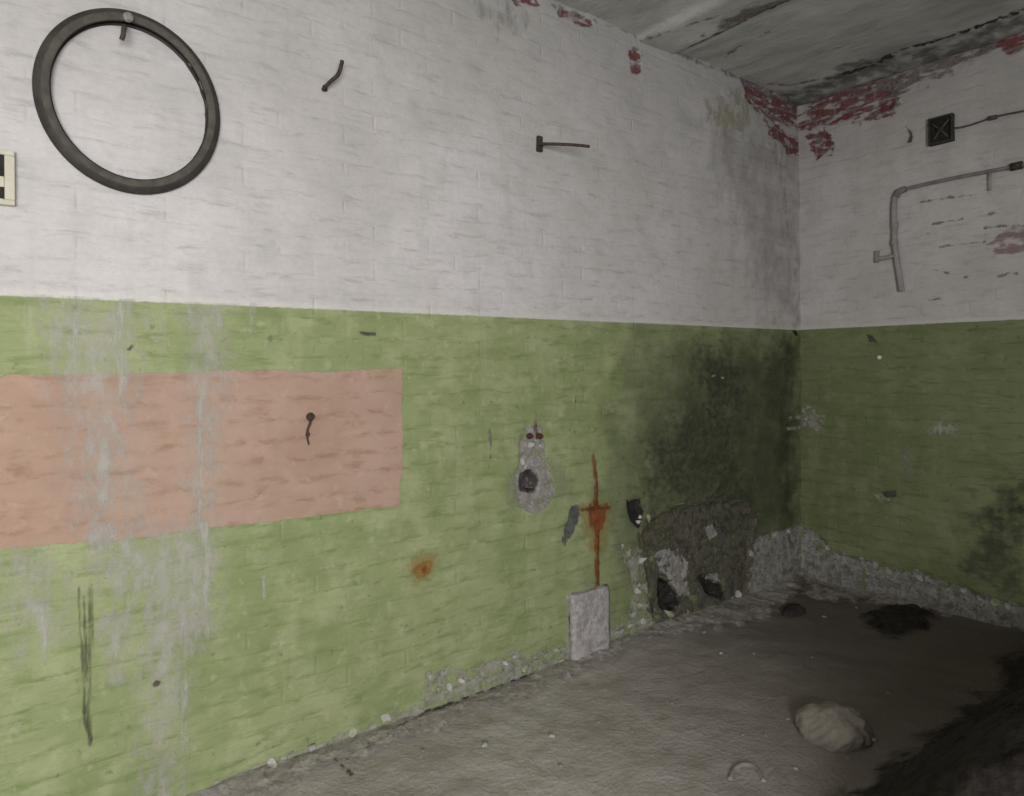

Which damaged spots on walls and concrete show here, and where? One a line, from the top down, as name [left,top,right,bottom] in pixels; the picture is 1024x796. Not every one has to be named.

flaking render [558,10,592,27]
flaking render [628,47,641,74]
flaking render [742,34,1024,160]
corrosion [581,455,610,587]
flaking render [610,495,1024,640]